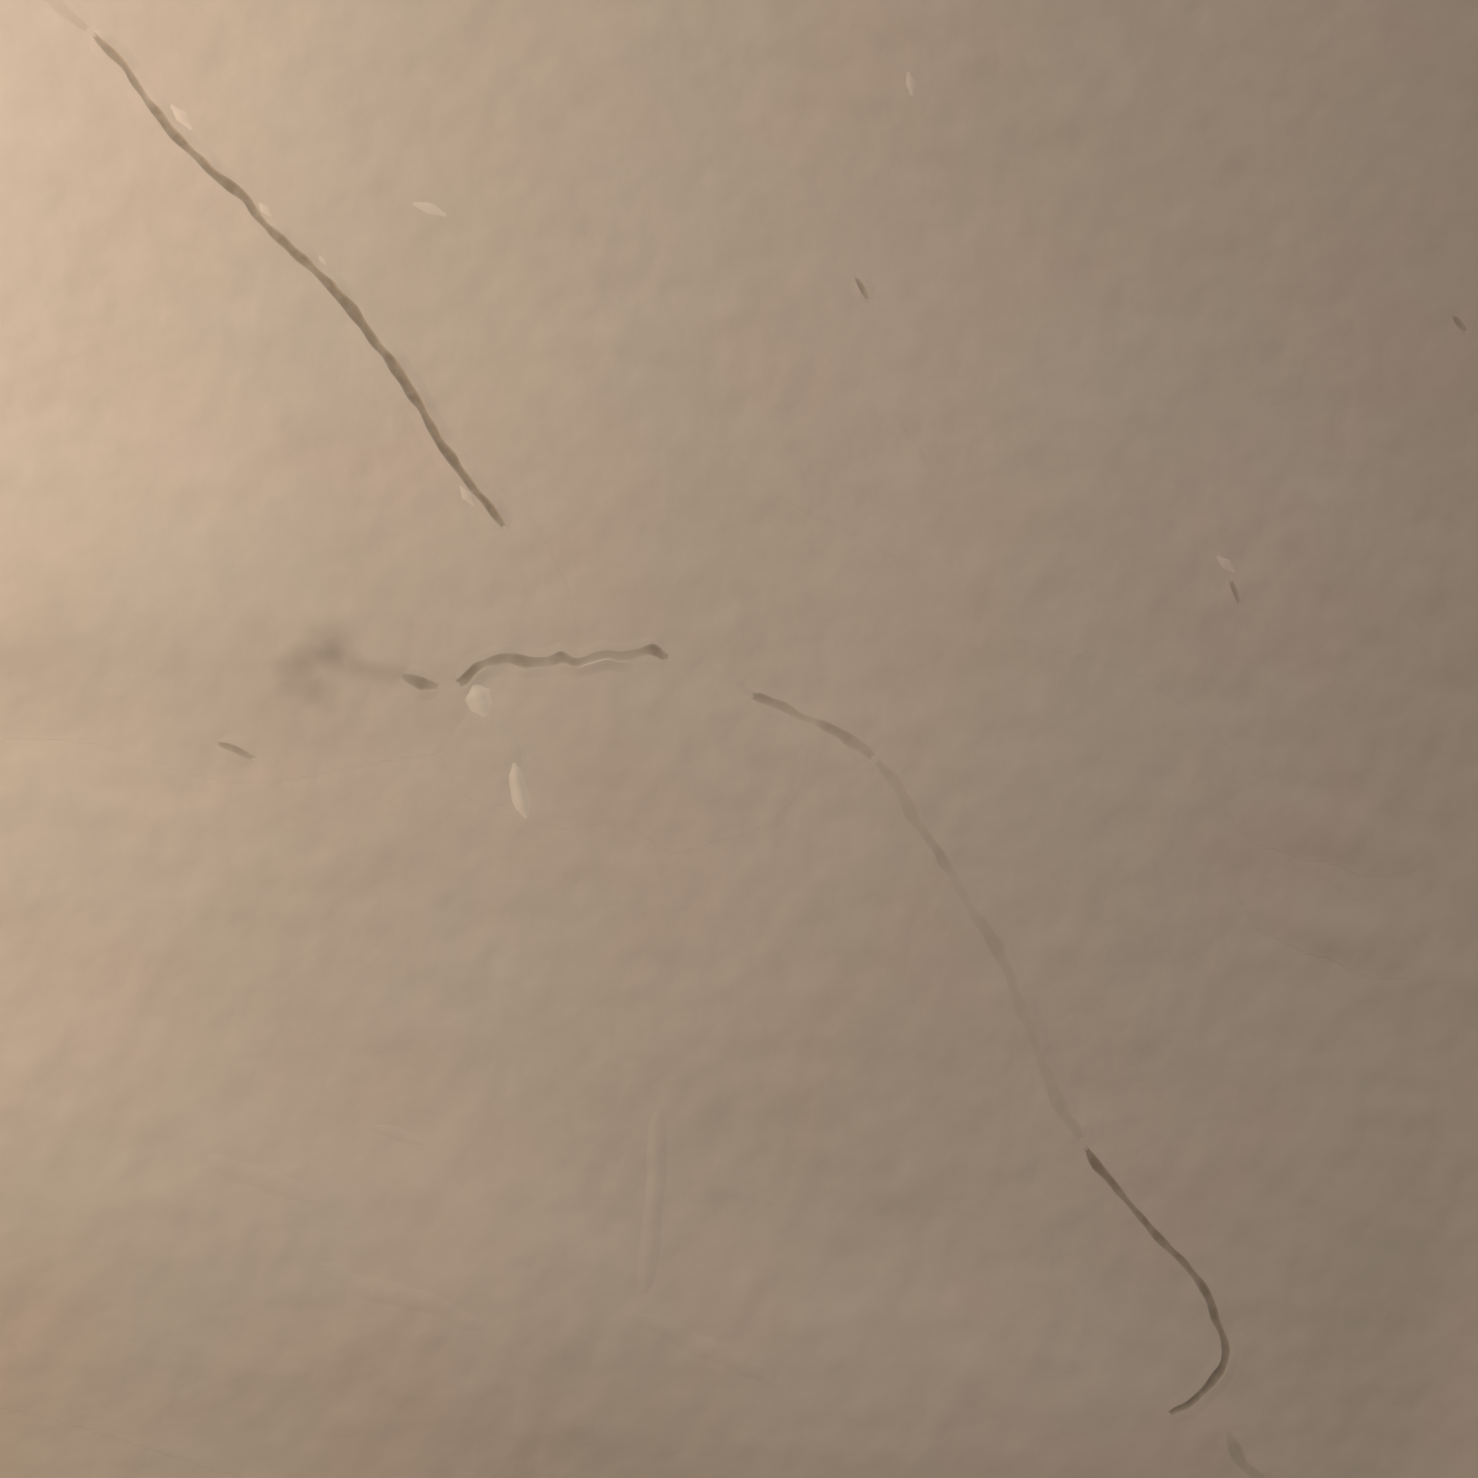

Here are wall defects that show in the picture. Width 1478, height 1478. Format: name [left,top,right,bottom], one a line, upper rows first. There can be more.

crack [31,0,512,531]
crack [398,634,669,819]